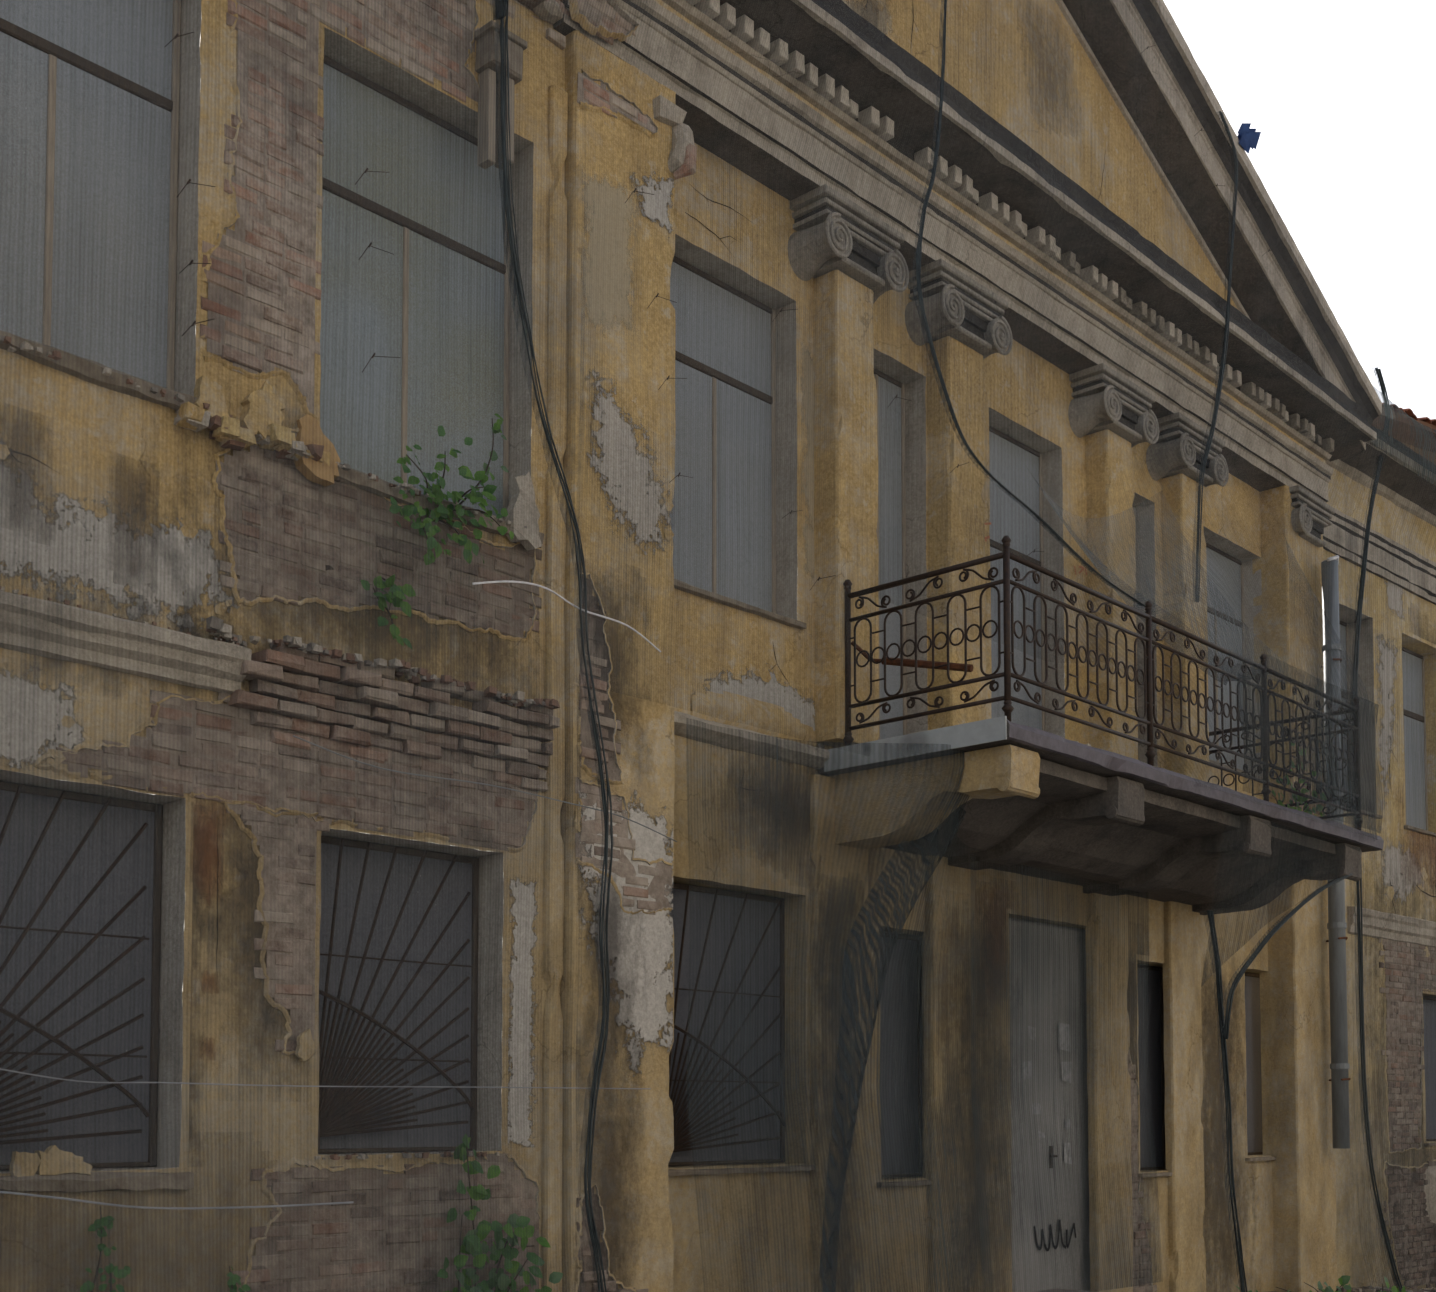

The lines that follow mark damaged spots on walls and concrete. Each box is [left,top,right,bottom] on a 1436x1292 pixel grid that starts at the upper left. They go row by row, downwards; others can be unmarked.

spalling [199,0,480,437]
peeling [627,172,675,239]
spalling [0,439,542,643]
peeling [586,366,675,562]
peeling [0,662,85,771]
spalling [223,800,330,1060]
peeling [574,571,673,1077]
spalling [231,877,541,1292]
spalling [1378,938,1436,1290]